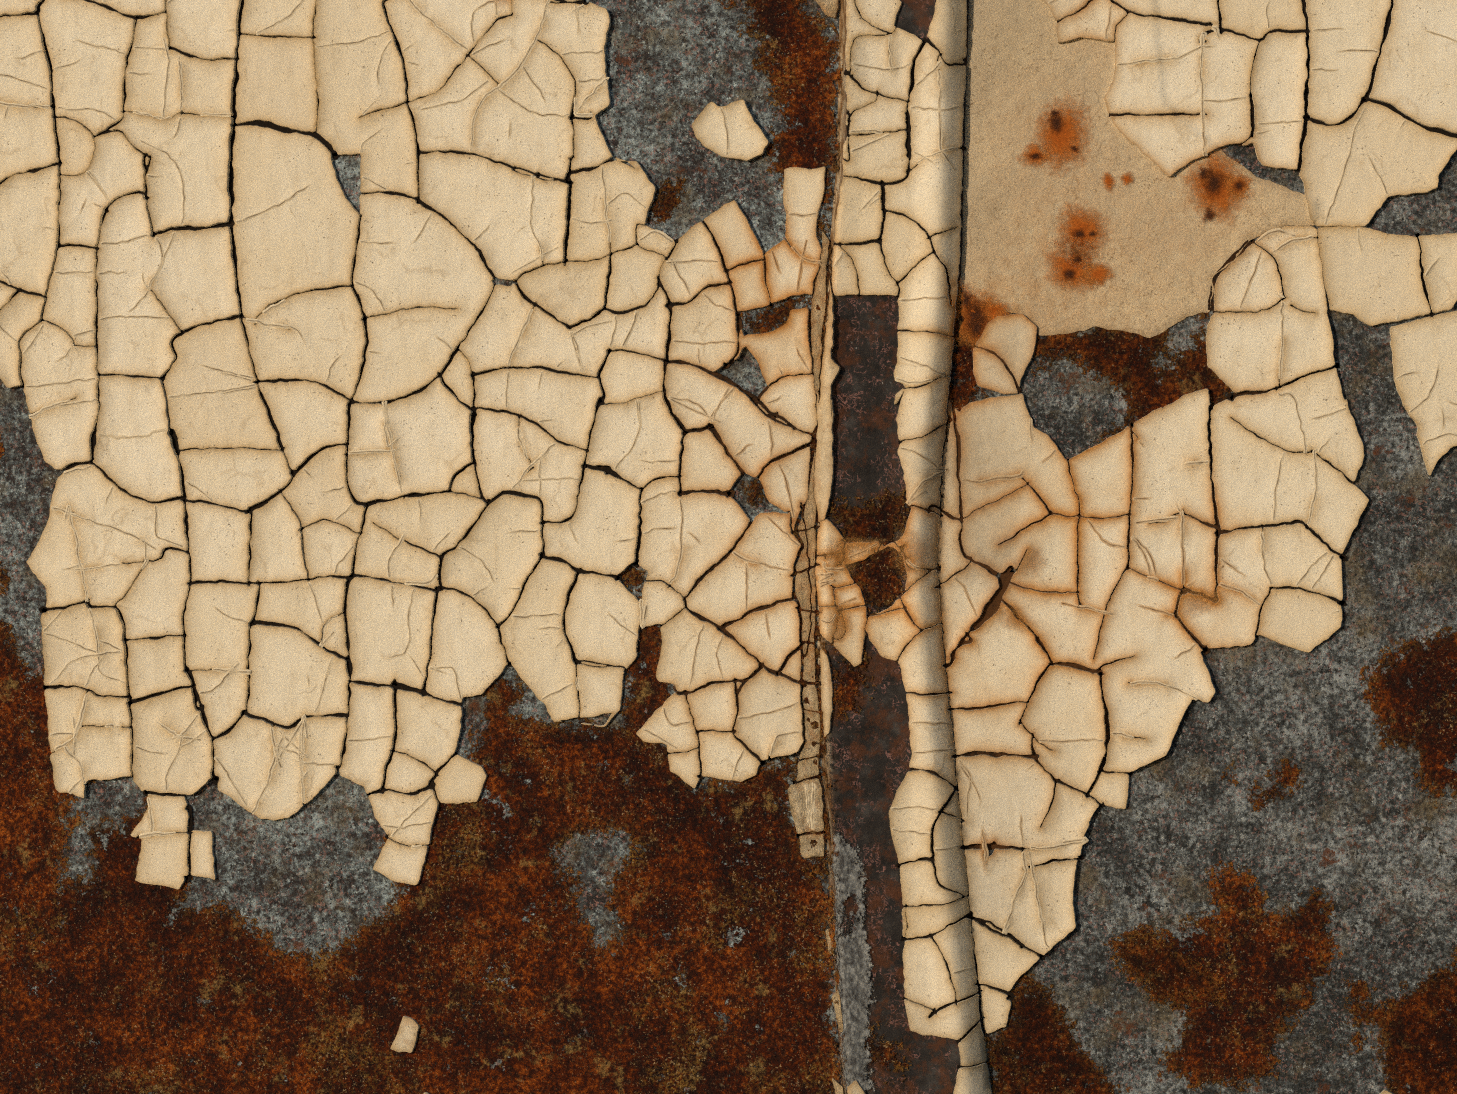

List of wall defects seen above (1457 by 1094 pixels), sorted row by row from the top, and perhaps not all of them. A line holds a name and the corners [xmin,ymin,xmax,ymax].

crack [1110,0,1457,172]
crack [1415,233,1435,317]
peeling [0,0,841,821]
rust [0,0,915,1094]
crack [0,0,1354,882]
peeling [795,0,1457,1094]
peeling [368,689,487,886]
peeling [636,668,825,858]
crack [895,768,1045,1018]
rust [984,971,1132,1094]
rust [1103,860,1457,1094]
rust [1359,623,1457,809]